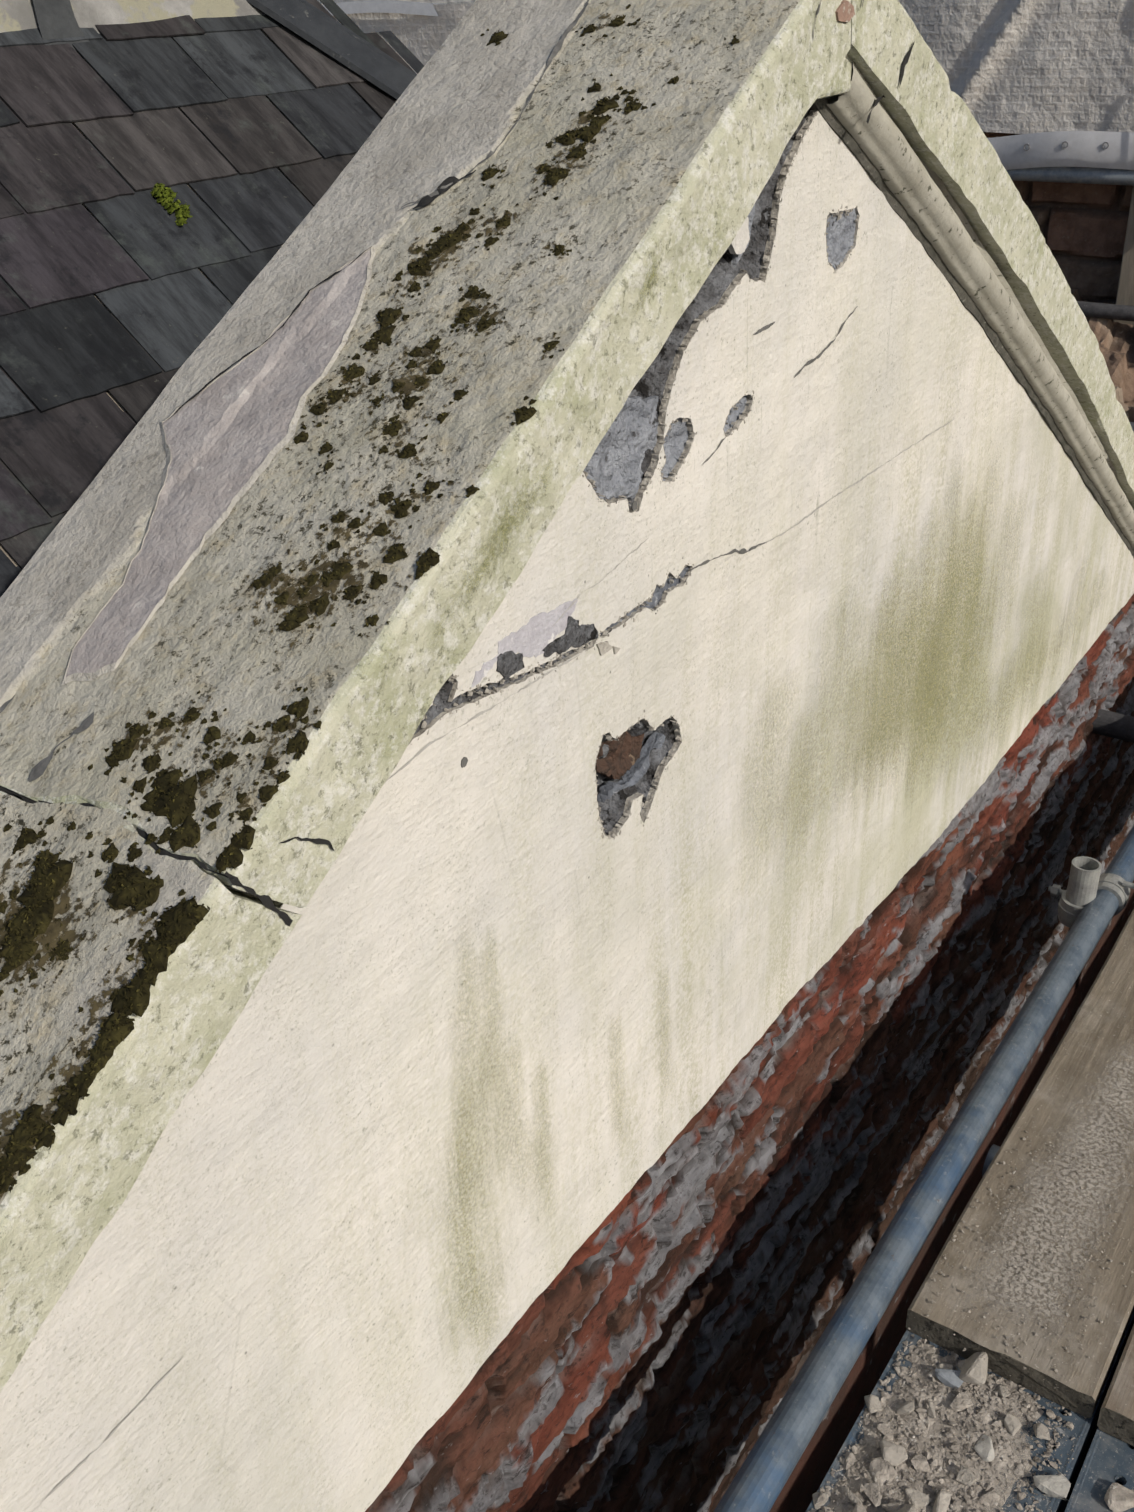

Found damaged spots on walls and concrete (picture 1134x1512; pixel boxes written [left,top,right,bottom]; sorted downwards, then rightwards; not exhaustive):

peeling [824,206,860,273]
spalling [582,109,818,516]
crack [794,306,858,378]
peeling [61,244,376,686]
crack [389,413,964,779]
damp [871,536,1010,755]
crack [0,695,15,713]
crack [0,712,94,807]
spalling [594,710,682,840]
crack [137,828,293,926]
crack [280,837,334,851]